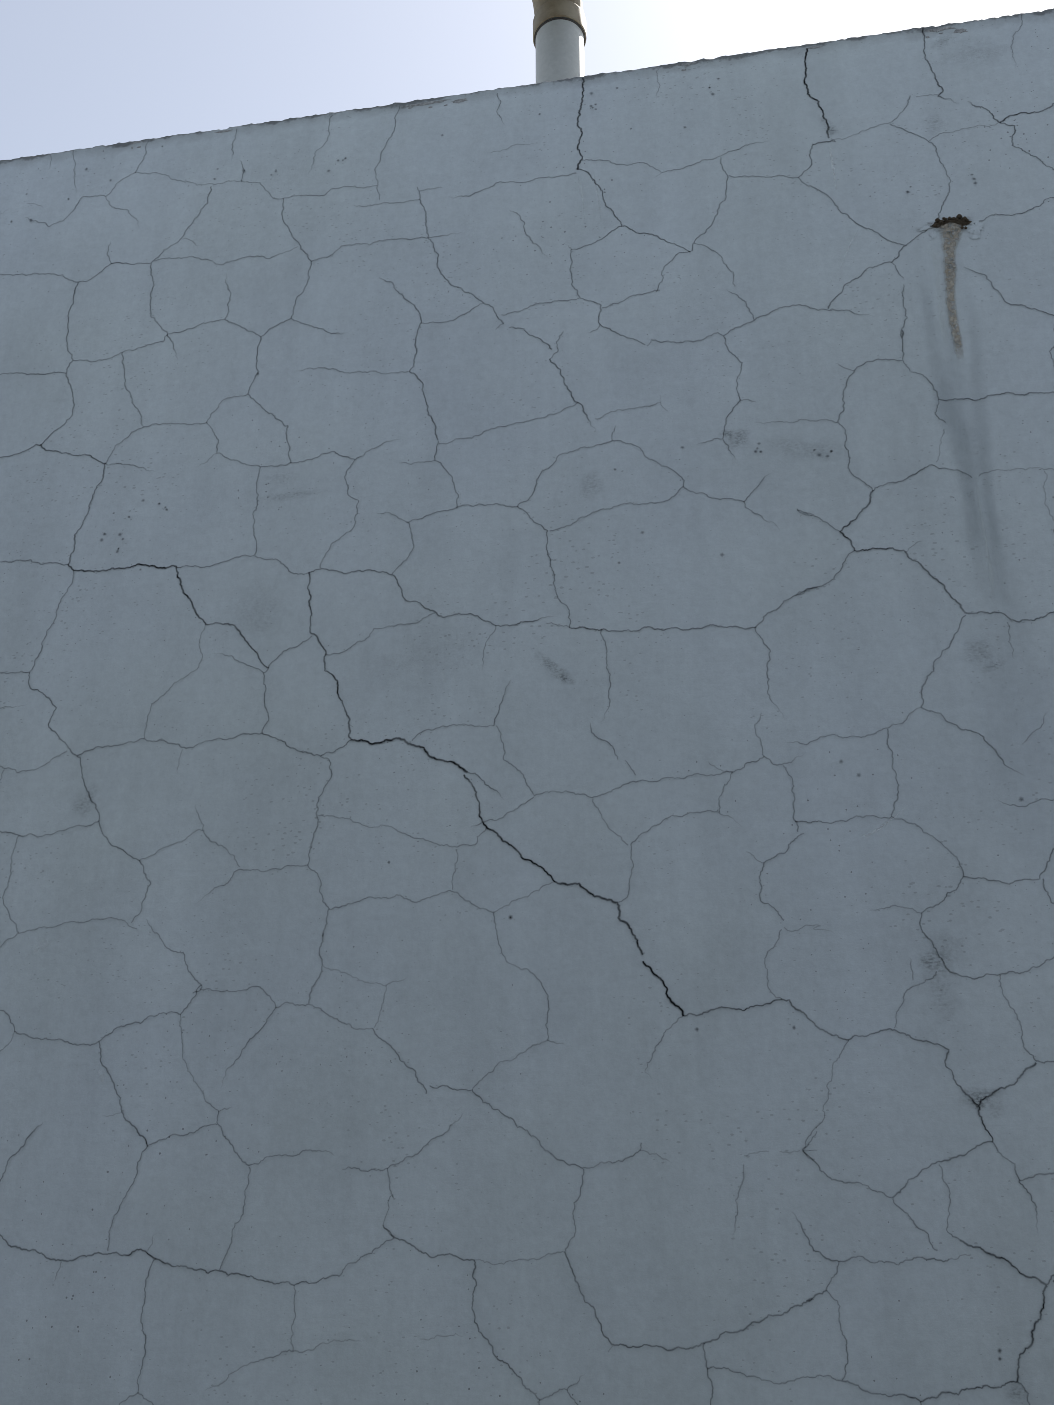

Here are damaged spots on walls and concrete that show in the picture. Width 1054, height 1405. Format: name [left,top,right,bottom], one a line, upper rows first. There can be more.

crack [577,79,707,249]
crack [804,48,829,138]
crack [989,107,1050,157]
rust [941,223,962,347]
crack [4,428,1053,1162]
crack [0,1235,338,1387]
crack [366,1232,519,1377]
crack [565,1236,844,1405]
crack [886,1228,1054,1402]